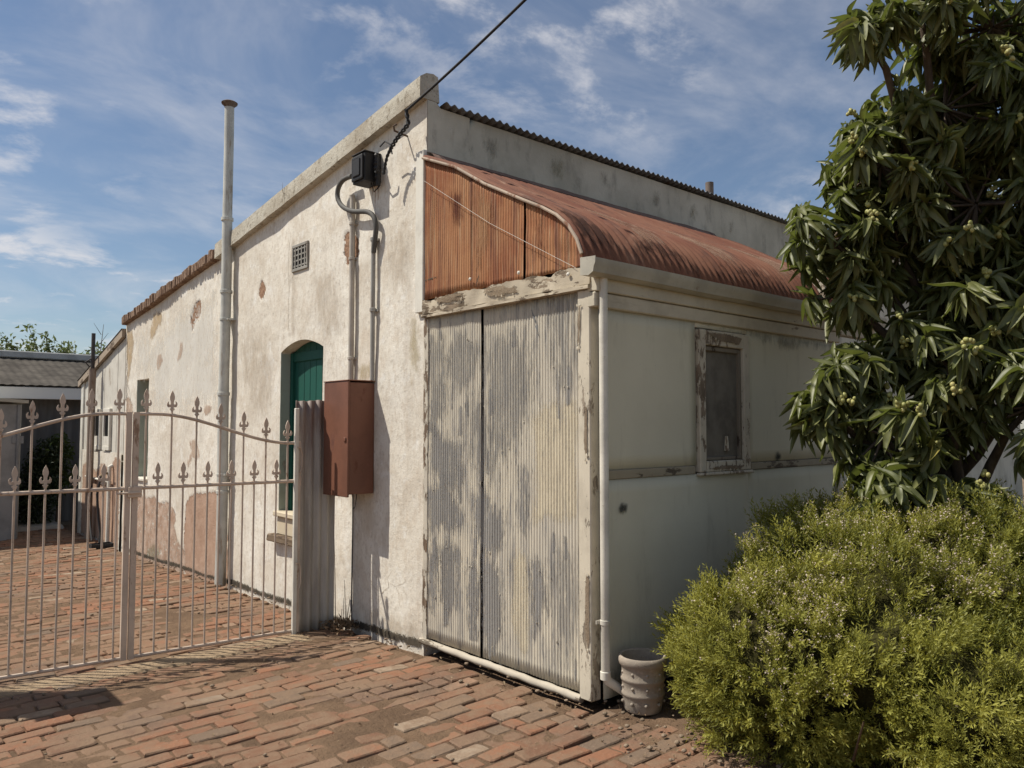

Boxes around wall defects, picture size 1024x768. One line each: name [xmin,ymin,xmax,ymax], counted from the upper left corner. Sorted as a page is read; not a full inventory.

rust [451,192,461,226]
rust [562,211,612,247]
flaking render [343,231,359,265]
flaking render [190,301,201,330]
peeling [427,293,590,681]
flaking render [136,491,228,587]